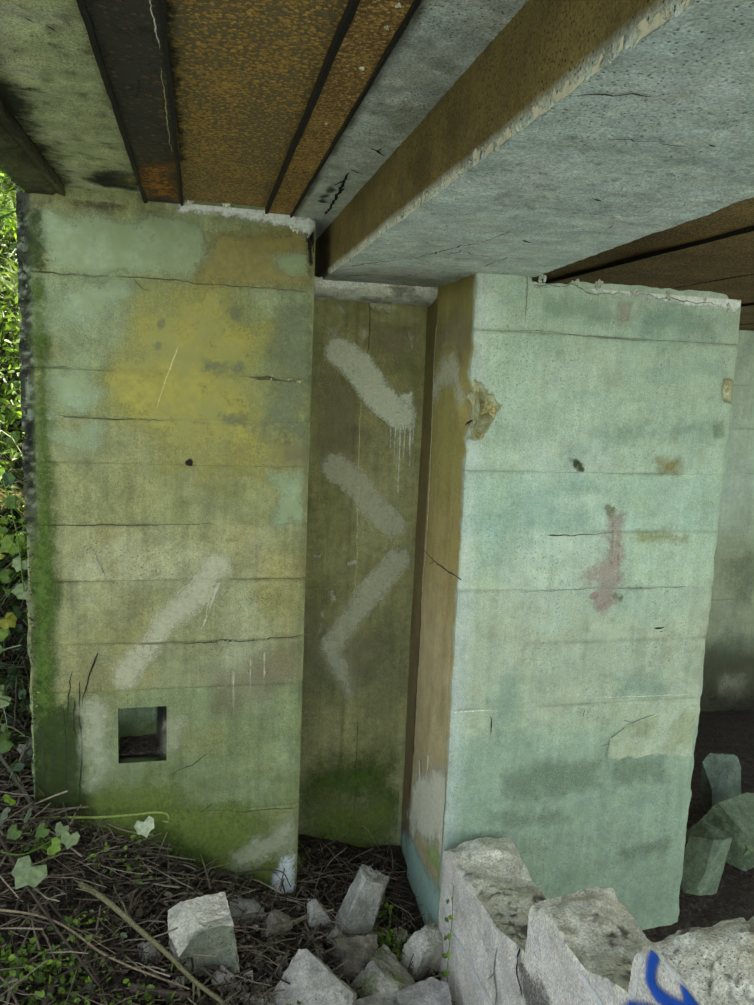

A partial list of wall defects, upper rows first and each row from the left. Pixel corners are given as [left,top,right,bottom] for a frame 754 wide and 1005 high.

leakage [0,78,71,186]
leakage [83,170,137,190]
rust [125,0,349,207]
crack [334,231,510,278]